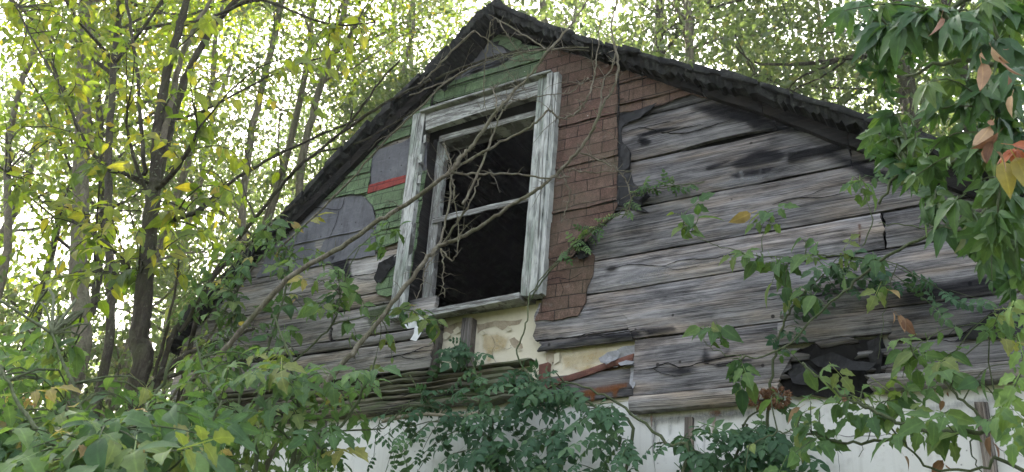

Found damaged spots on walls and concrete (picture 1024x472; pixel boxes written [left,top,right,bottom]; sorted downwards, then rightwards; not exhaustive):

peeling [400,253,412,304]
spalling [477,319,523,351]
peeling [599,345,635,388]
corrosion [575,383,627,401]